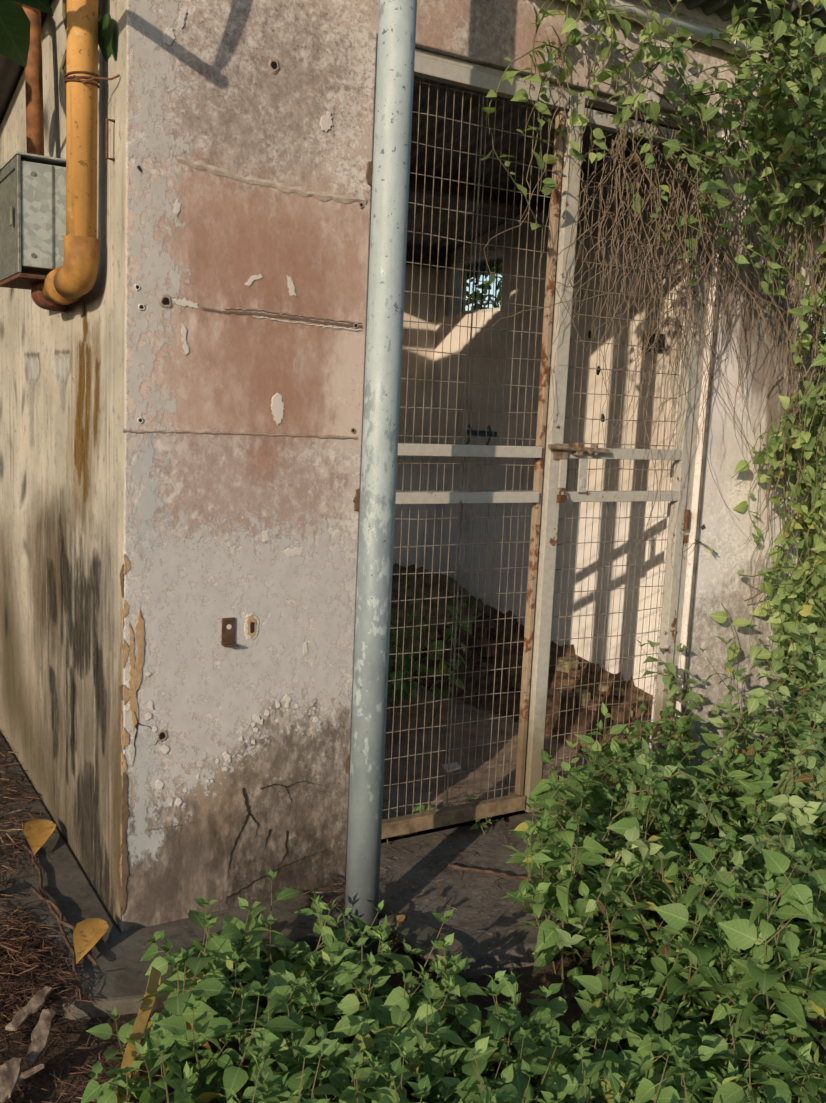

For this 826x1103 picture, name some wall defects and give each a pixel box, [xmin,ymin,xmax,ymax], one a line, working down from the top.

corrosion [74,301,99,502]
peeling [126,0,199,439]
peeling [270,393,285,425]
peeling [286,275,296,297]
peeling [320,111,333,132]
water stain [718,233,796,442]
water stain [3,573,42,785]
water stain [33,510,116,924]
peeling [113,488,361,921]
crack [147,781,326,898]
water stain [128,715,347,929]